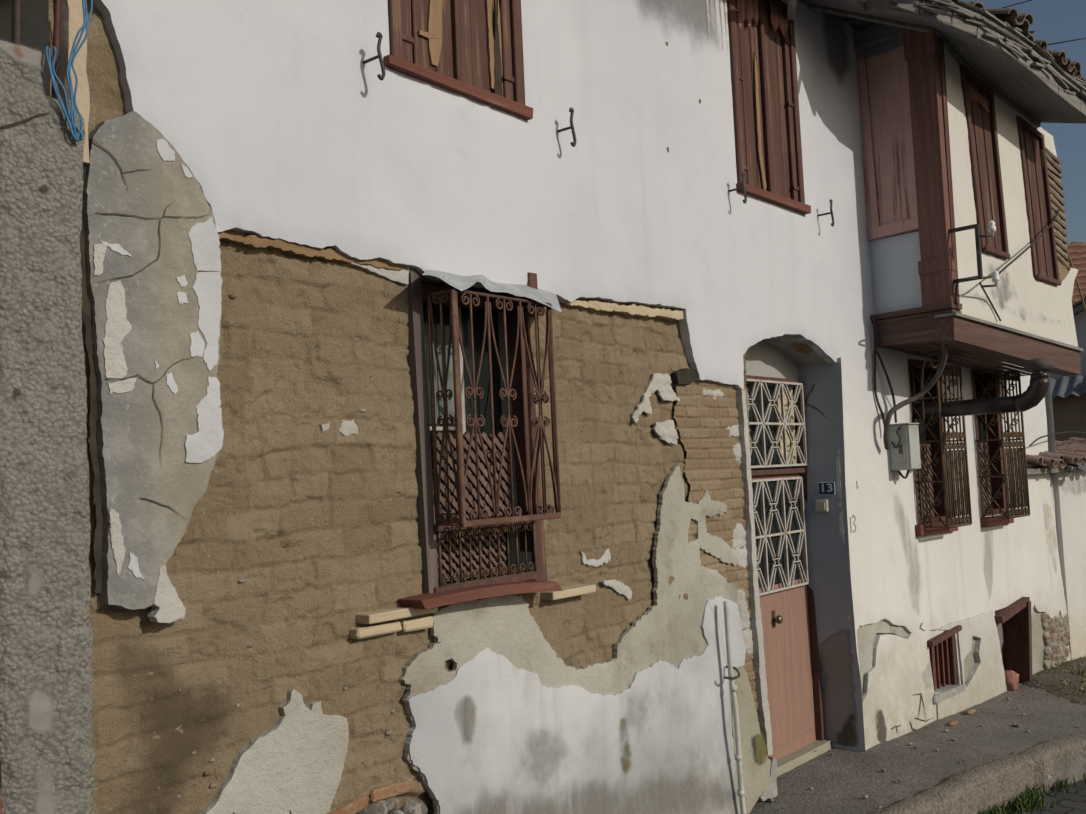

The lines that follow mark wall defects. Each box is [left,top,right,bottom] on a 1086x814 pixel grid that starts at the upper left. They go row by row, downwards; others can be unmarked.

water stain [643,0,729,48]
crack [80,139,209,593]
spalling [82,0,778,814]
spalling [857,619,909,689]
water stain [838,715,856,745]